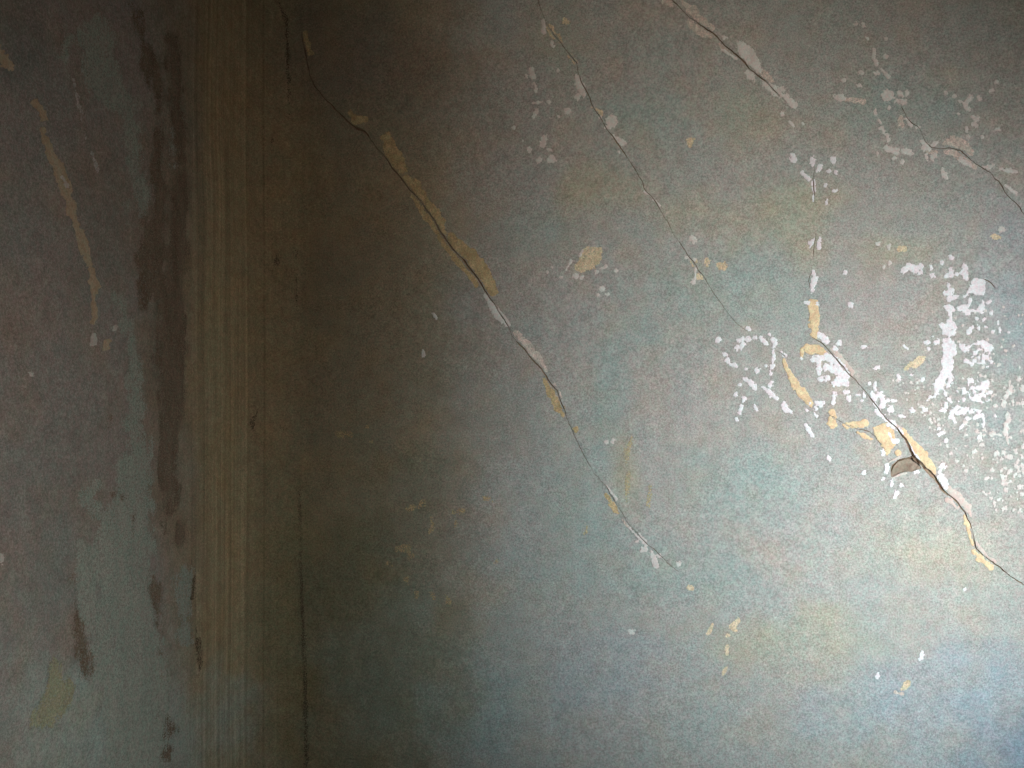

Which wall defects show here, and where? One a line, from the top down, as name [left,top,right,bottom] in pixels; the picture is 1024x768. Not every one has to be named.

crack [538,0,744,329]
crack [661,0,805,128]
crack [789,153,838,205]
peeling [833,21,910,110]
crack [837,96,1024,214]
peeling [943,80,1001,139]
crack [301,31,682,570]
peeling [546,246,618,297]
leakage [26,2,203,768]
peeling [715,326,825,438]
crack [800,236,1024,585]
peeling [875,241,1024,513]